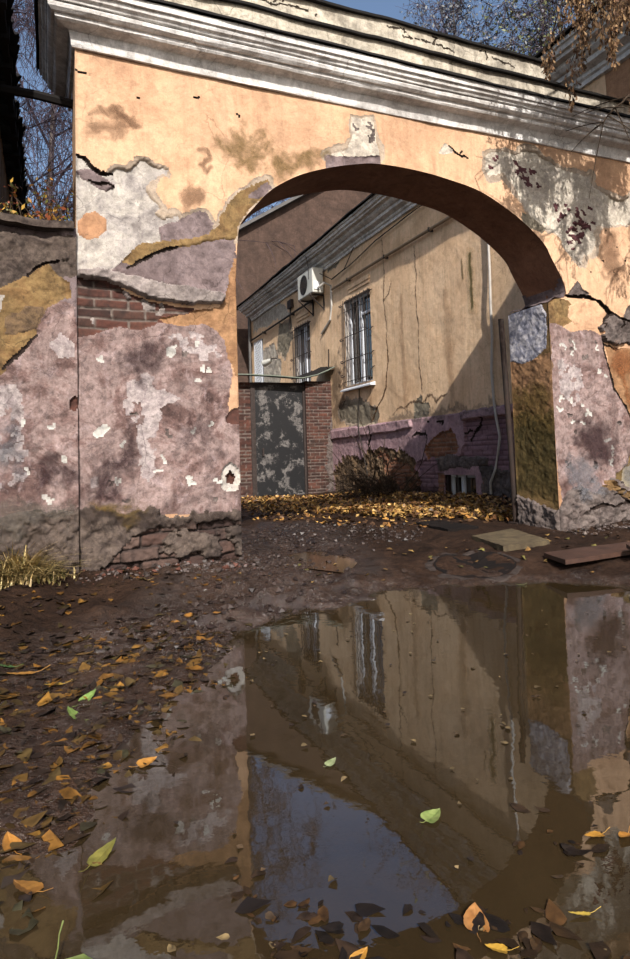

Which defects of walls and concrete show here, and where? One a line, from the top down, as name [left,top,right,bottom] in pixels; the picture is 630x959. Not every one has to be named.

crack [261,0,317,17]
crack [76,153,115,189]
damp [91,107,138,130]
spalling [320,114,385,168]
spalling [481,143,630,273]
peeling [0,155,276,577]
spalling [253,303,293,383]
peeling [378,278,630,531]
crack [564,294,630,417]